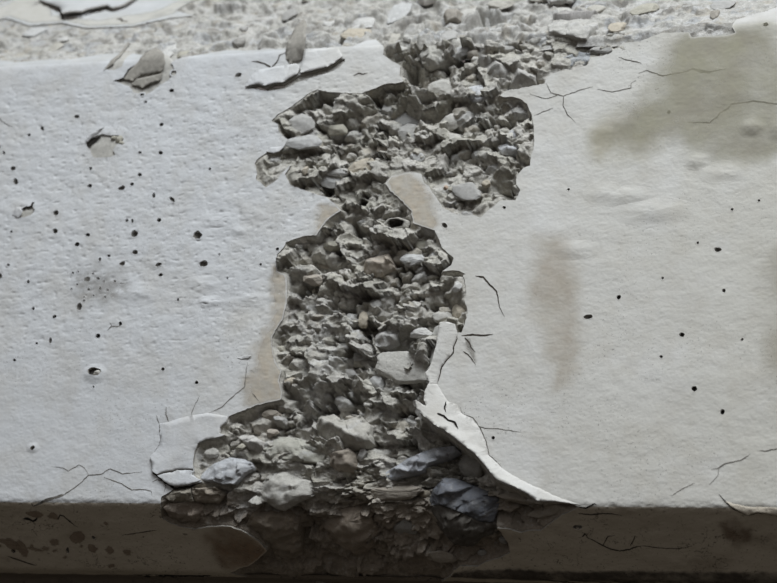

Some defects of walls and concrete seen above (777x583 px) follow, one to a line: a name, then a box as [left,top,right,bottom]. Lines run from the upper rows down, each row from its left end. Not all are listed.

spalling [0,0,777,94]
crack [531,57,670,122]
damp [625,31,775,152]
peeling [85,127,124,158]
spalling [150,35,618,579]
crack [478,276,504,315]
crack [437,334,492,383]
crack [23,465,174,527]
crack [577,503,690,551]
crack [673,449,776,495]